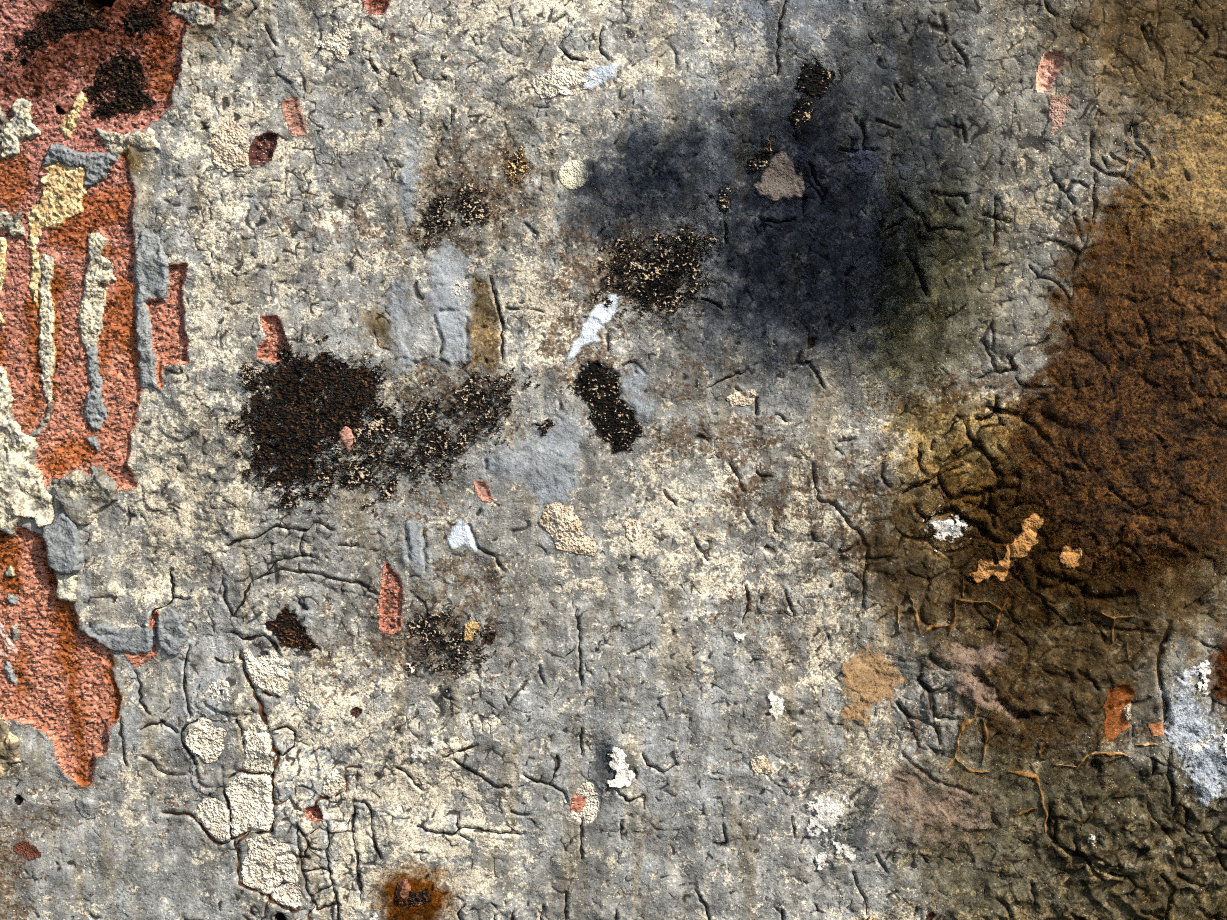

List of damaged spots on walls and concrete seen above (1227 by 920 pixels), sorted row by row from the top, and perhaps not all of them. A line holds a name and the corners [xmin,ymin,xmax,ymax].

spalling [209,97,307,172]
spalling [0,0,243,491]
spalling [257,315,293,366]
corrosion [970,85,1227,583]
crack [902,343,1060,544]
spalling [0,526,190,787]
crack [118,646,203,775]
crack [164,522,381,920]
spalling [243,648,310,712]
corrosion [1210,630,1227,700]
crack [418,818,524,841]
corrosion [382,869,453,920]